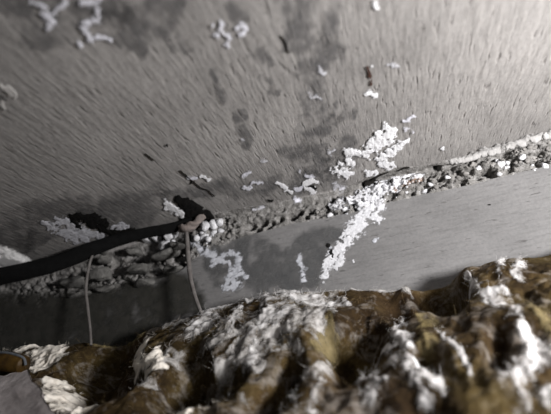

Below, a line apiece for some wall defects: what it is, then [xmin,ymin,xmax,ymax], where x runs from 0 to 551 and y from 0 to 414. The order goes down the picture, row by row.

efflorescence [29,0,68,32]
efflorescence [77,0,113,48]
efflorescence [211,21,248,48]
peeling [41,212,135,245]
peeling [163,195,215,222]
damp [190,115,425,294]
spalling [58,250,122,298]
spalling [125,231,185,288]